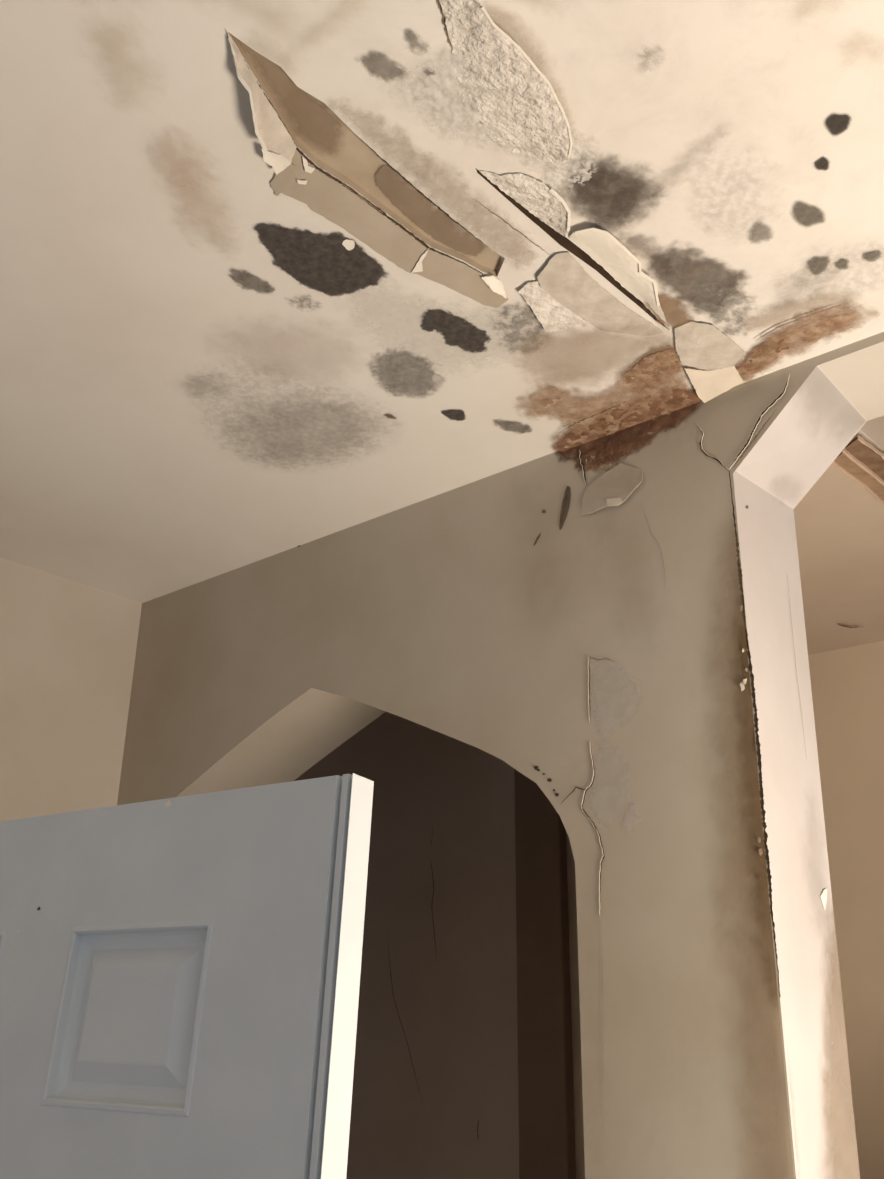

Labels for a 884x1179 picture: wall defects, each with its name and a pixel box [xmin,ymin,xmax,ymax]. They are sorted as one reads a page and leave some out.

peeling [436,0,572,164]
mould [826,115,851,136]
spalling [226,30,746,403]
water stain [536,137,658,227]
mould [794,203,824,227]
water stain [230,270,275,293]
water stain [254,224,543,396]
water stain [628,237,748,335]
water stain [442,410,465,421]
spalling [832,435,884,504]
crack [697,374,790,998]
crack [533,656,615,1125]